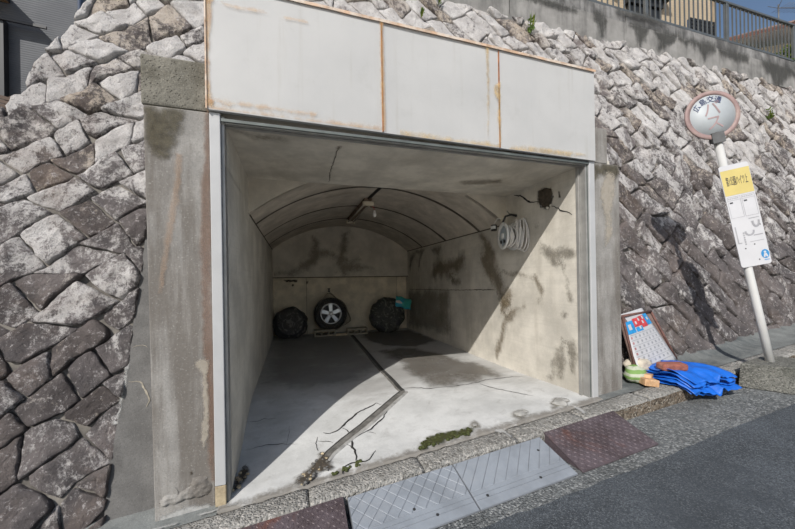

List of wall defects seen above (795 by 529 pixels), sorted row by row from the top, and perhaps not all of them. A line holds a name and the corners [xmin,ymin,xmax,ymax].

leakage [144,107,183,158]
crack [515,195,572,215]
spalling [537,187,561,210]
leakage [481,237,513,351]
leakage [365,330,497,384]
crack [315,403,387,474]